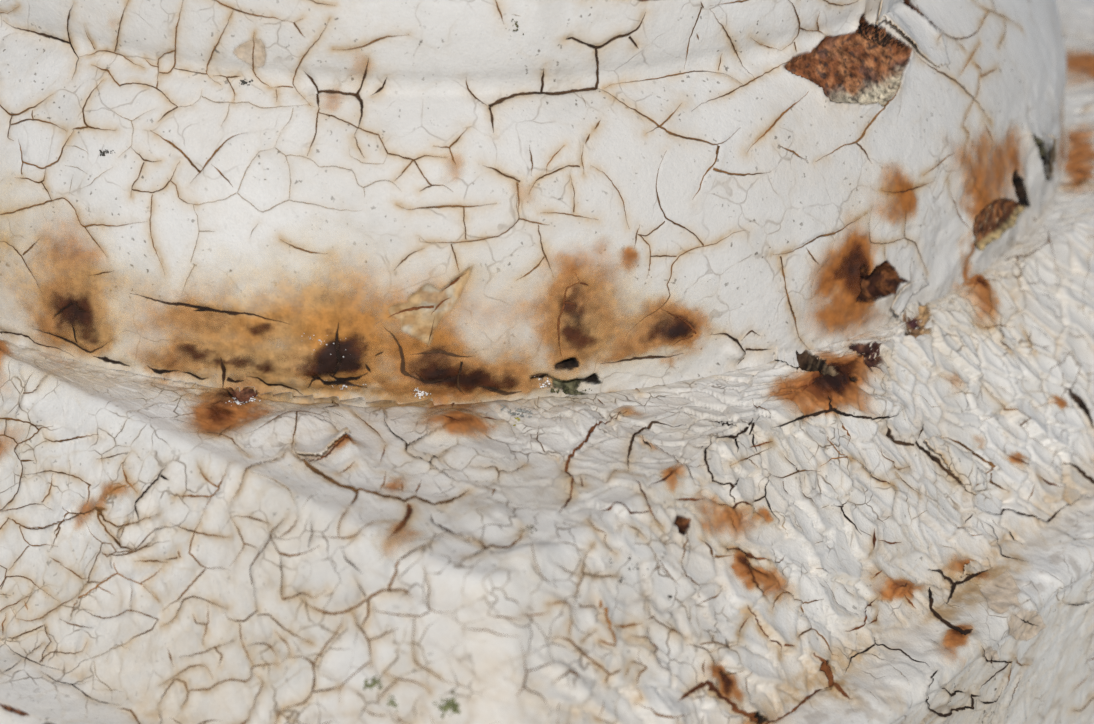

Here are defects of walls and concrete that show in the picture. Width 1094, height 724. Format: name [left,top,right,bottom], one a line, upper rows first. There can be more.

crack [748,83,901,162]
peeling [784,0,950,107]
crack [773,0,1023,349]
corrosion [961,133,1020,220]
corrosion [1066,52,1094,79]
corrosion [35,237,113,354]
crack [0,0,768,724]
corrosion [141,256,707,435]
corrosion [770,352,870,416]
corrosion [815,231,874,333]
crack [602,373,1094,635]
crack [679,541,1031,724]